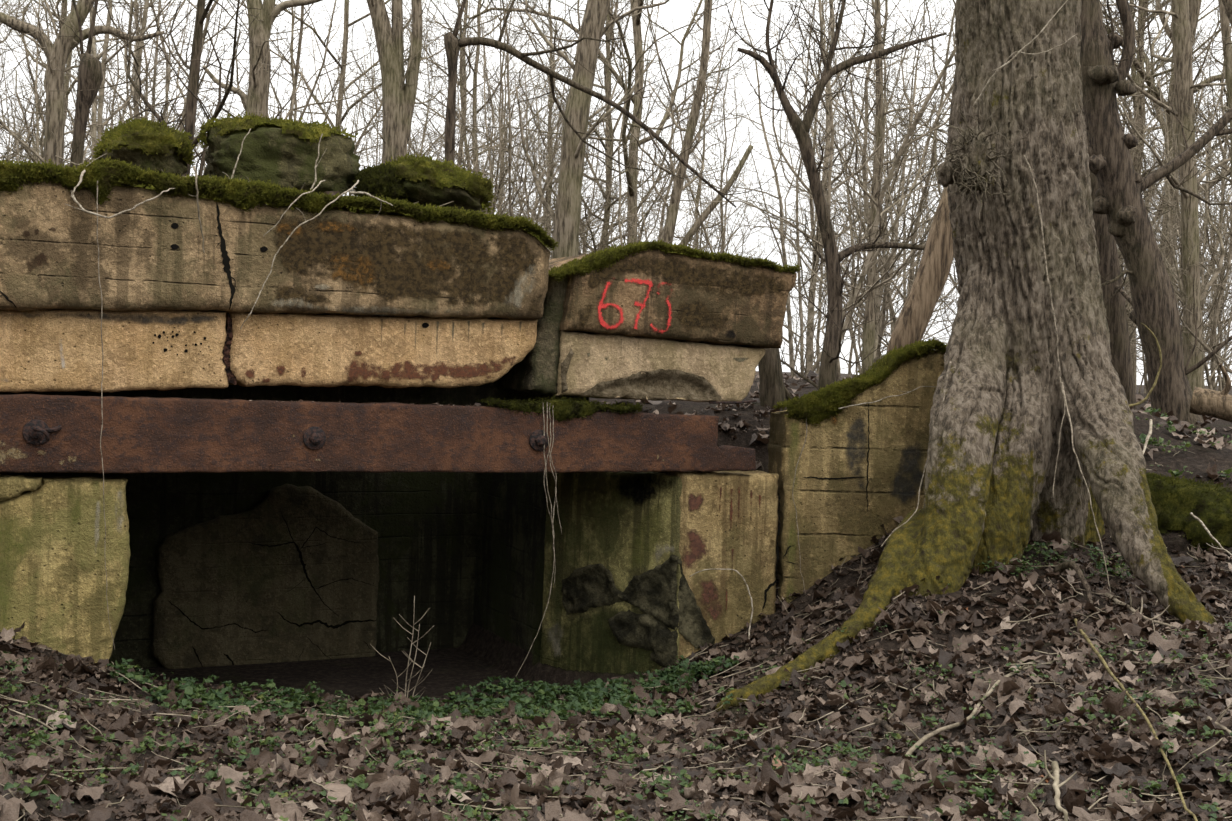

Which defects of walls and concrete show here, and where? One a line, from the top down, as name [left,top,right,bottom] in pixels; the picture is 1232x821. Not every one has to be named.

crack [216,202,238,385]
corrosion [245,366,285,383]
corrosion [346,351,515,382]
crack [167,512,377,667]